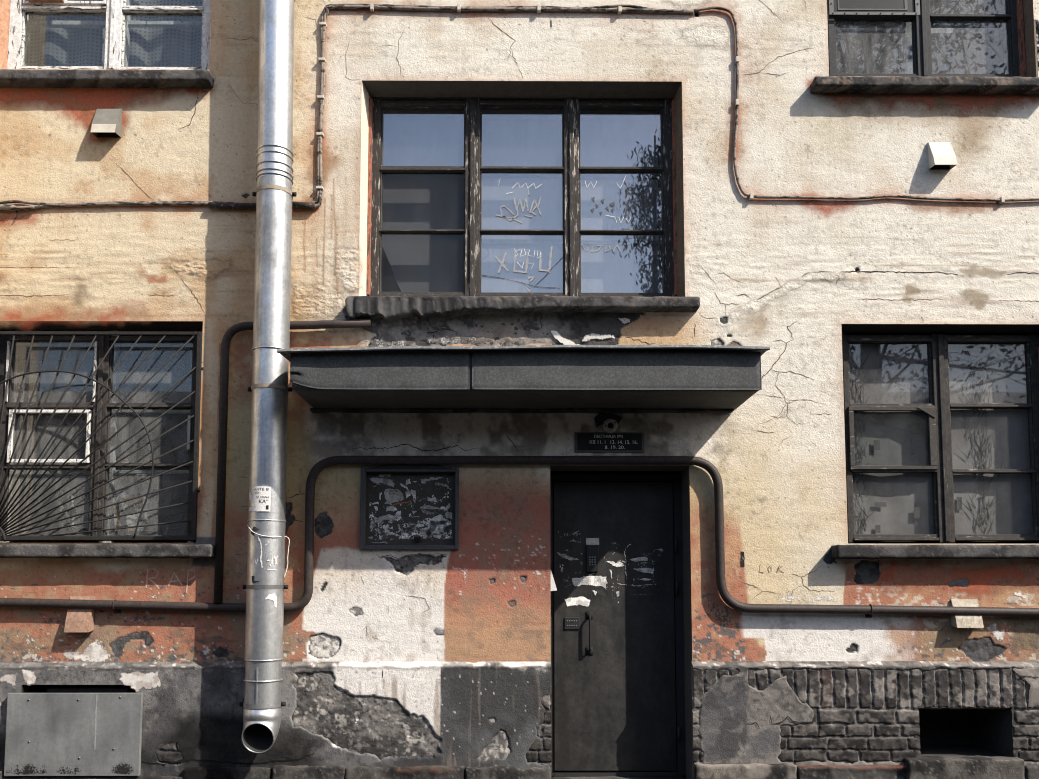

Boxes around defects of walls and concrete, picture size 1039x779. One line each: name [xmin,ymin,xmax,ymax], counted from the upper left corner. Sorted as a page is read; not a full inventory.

corrosion [0,87,205,141]
flaking render [363,312,636,347]
crack [694,268,958,337]
crack [758,321,827,443]
flaking render [386,554,445,575]
flaking render [854,561,879,595]
peeling [62,615,167,662]
flaking render [310,634,340,658]
flaking render [292,672,441,760]
flaking render [477,719,510,761]
flaking render [526,695,551,765]
flaking render [692,623,1039,765]